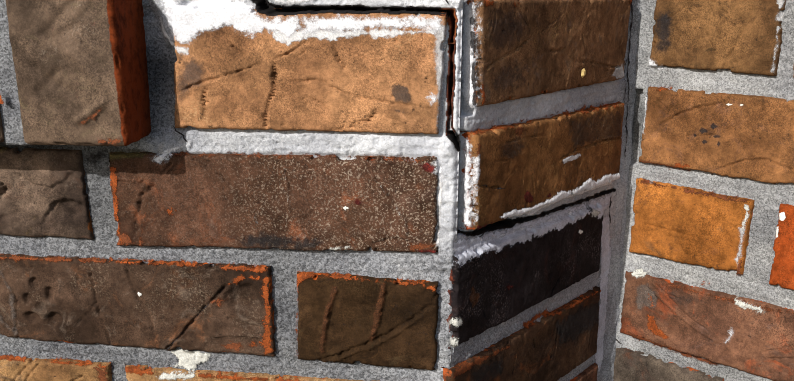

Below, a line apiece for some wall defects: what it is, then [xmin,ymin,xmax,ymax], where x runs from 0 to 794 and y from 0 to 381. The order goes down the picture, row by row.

crack [250,0,461,152]
crack [623,0,633,157]
crack [457,188,616,237]